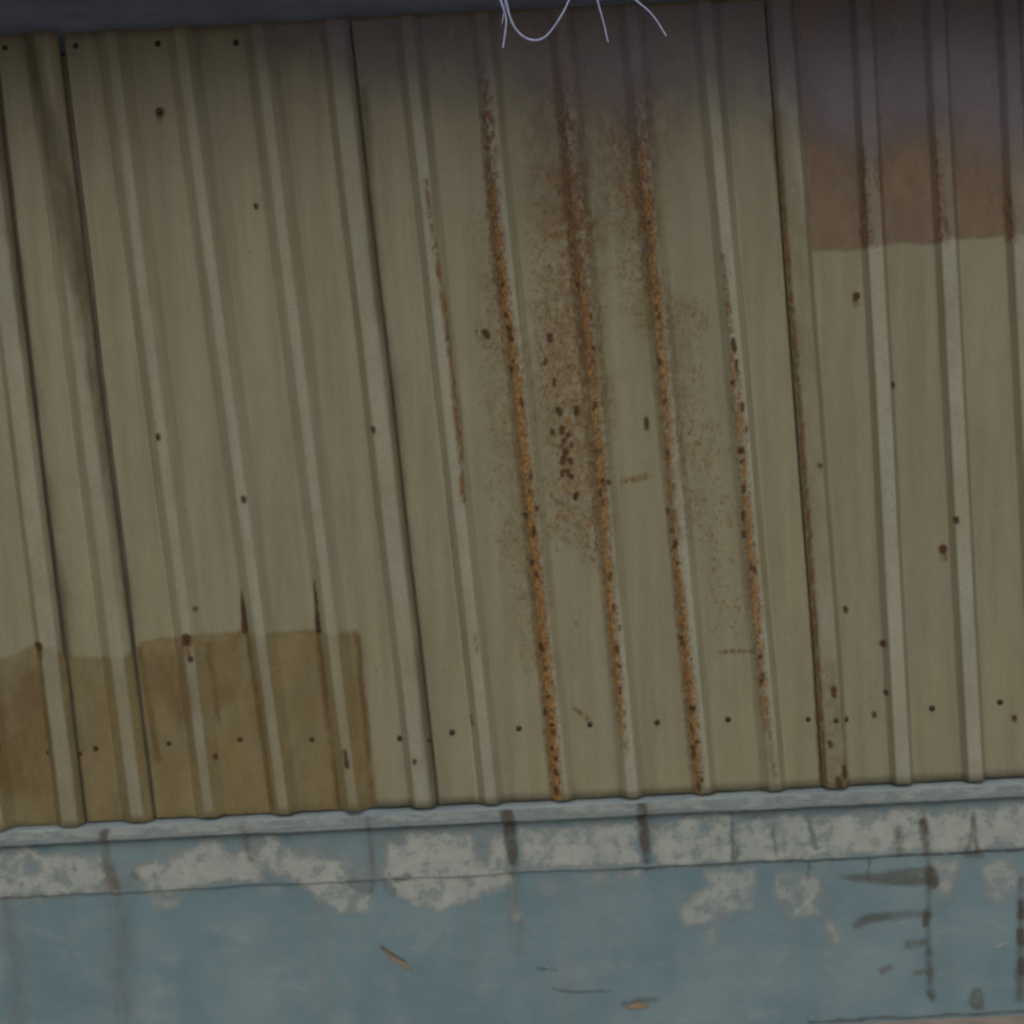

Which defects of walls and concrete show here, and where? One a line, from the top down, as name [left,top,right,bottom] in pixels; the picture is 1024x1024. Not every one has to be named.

leakage [271,14,495,71]
leakage [518,0,1024,250]
corrosion [480,56,629,801]
corrosion [612,84,771,793]
corrosion [775,153,847,788]
leakage [0,646,62,827]
leakage [58,654,131,836]
leakage [125,632,373,821]
peeling [0,784,1024,945]
leakage [848,867,939,887]